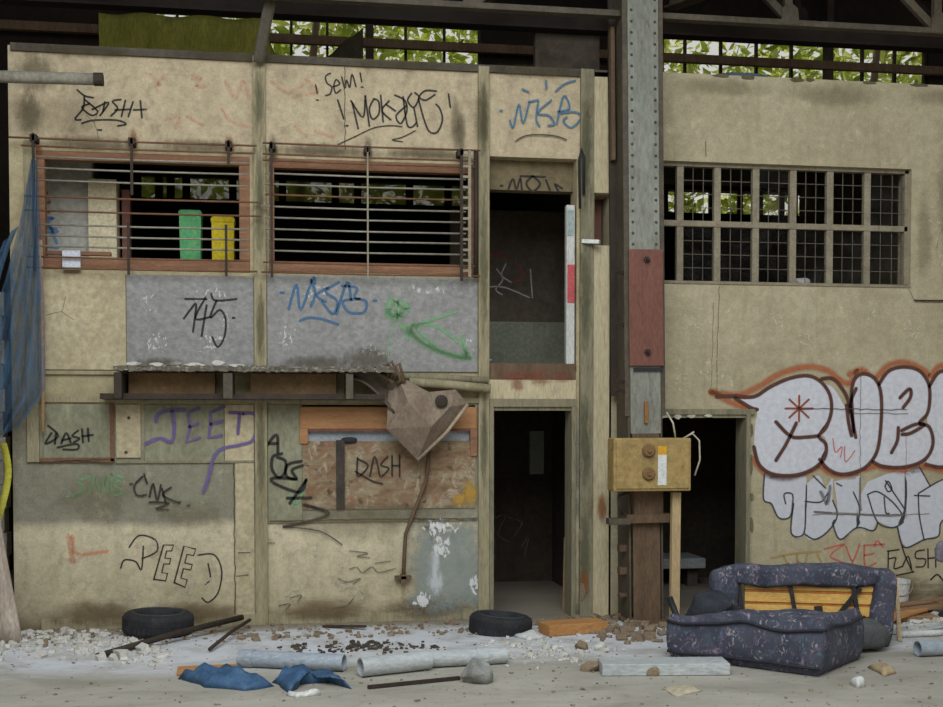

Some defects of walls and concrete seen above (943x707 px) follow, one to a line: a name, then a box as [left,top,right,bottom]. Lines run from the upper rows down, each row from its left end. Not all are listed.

peeling [409,518,478,612]
leakage [68,604,123,622]
leakage [293,601,351,617]
leakage [401,601,458,615]